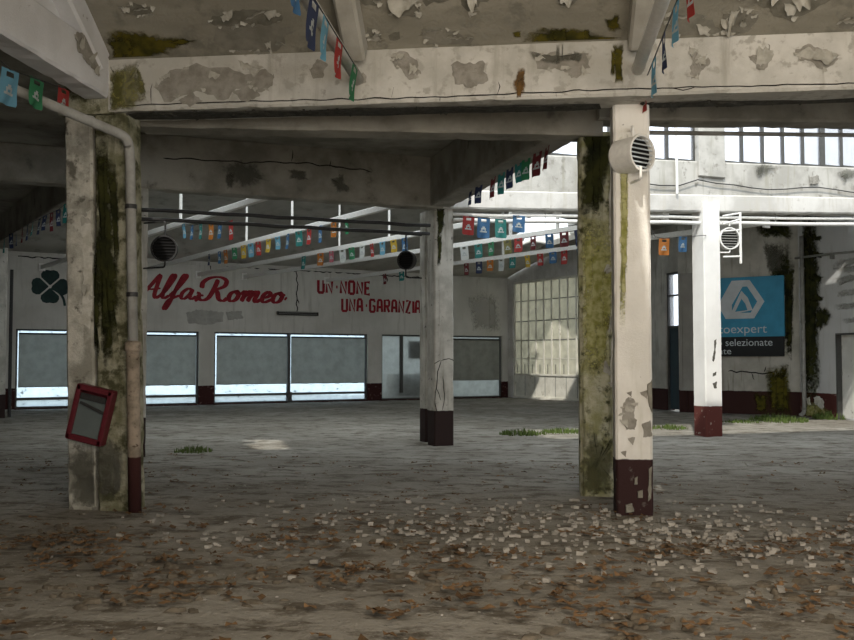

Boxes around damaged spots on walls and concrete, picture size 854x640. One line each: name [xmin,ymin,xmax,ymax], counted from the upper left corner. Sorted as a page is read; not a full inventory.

damp [109,37,136,58]
spalling [126,9,601,121]
peeling [361,0,449,18]
peeling [461,0,489,18]
peeling [664,0,830,80]
peeling [793,44,839,73]
damp [580,136,610,215]
damp [94,156,119,353]
damp [584,192,628,361]
peeling [618,380,652,457]
spalling [625,467,652,513]